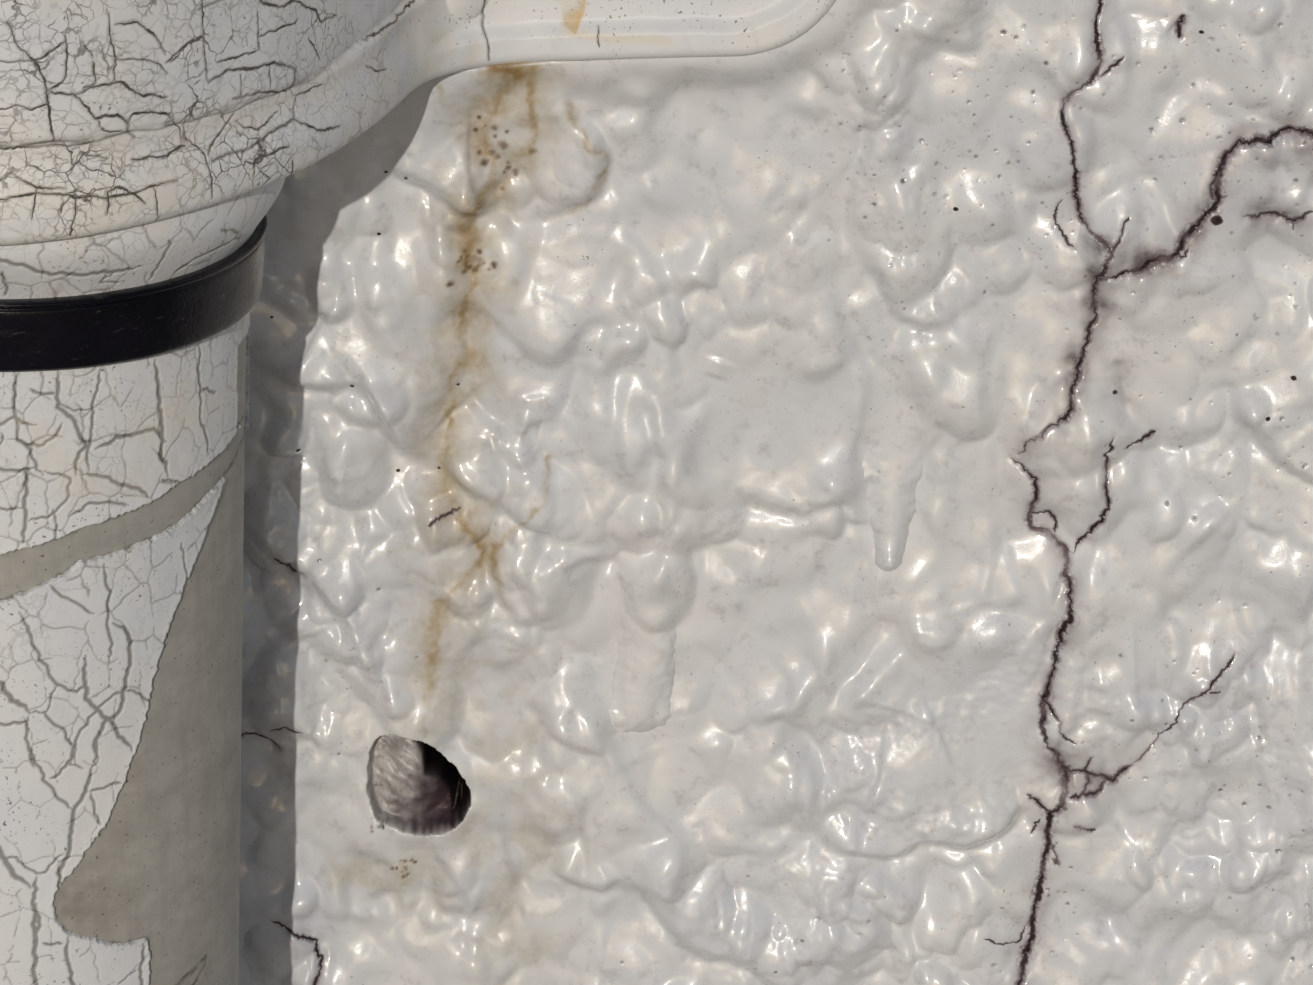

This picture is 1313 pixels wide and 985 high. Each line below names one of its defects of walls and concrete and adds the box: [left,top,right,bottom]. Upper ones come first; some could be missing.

crack [367,0,414,72]
corrosion [488,64,531,87]
crack [0,0,337,235]
crack [429,507,462,527]
crack [984,0,1313,985]
crack [242,727,299,751]
spalling [366,735,471,837]
crack [272,921,324,985]